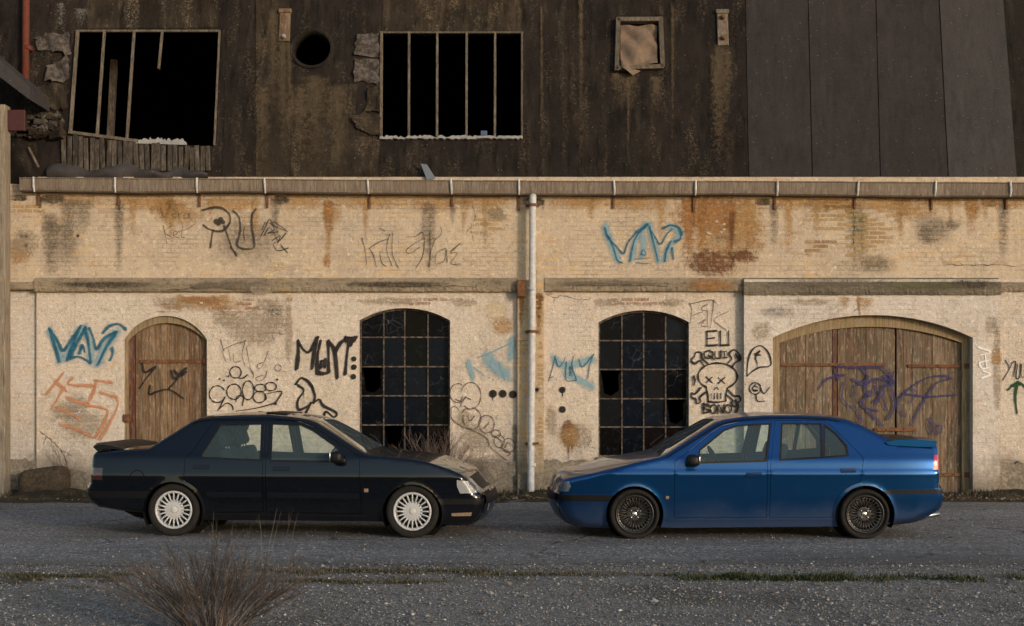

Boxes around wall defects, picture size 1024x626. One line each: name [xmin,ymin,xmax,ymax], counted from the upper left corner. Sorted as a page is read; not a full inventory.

damp [39,195,90,262]
rust [121,195,258,233]
rust [272,195,392,267]
rust [414,196,508,241]
rust [552,197,600,218]
rust [615,199,665,231]
rust [678,197,760,275]
rust [773,197,1024,244]
rust [561,420,578,456]